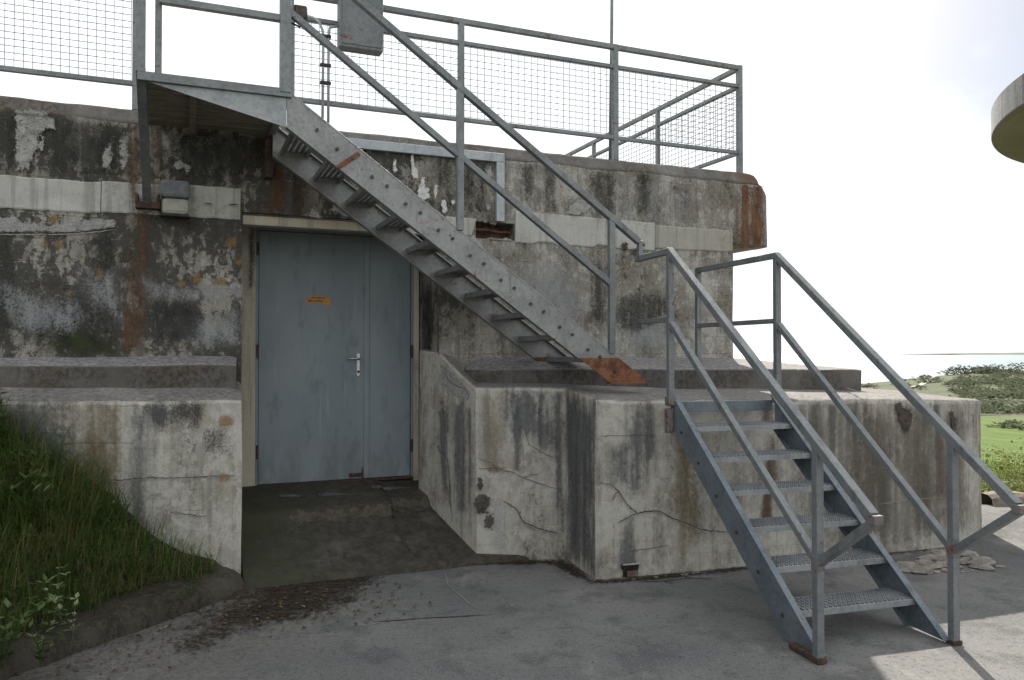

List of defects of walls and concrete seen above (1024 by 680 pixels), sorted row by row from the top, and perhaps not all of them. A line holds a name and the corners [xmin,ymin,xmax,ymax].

peeling [13,108,56,171]
water stain [46,119,123,174]
peeling [102,138,130,170]
peeling [410,154,455,213]
spalling [0,215,116,234]
rust [741,184,764,248]
water stain [0,237,115,338]
water stain [132,403,201,527]
crack [477,426,558,490]
crack [503,500,560,535]
water stain [505,391,597,566]
crack [599,482,727,533]